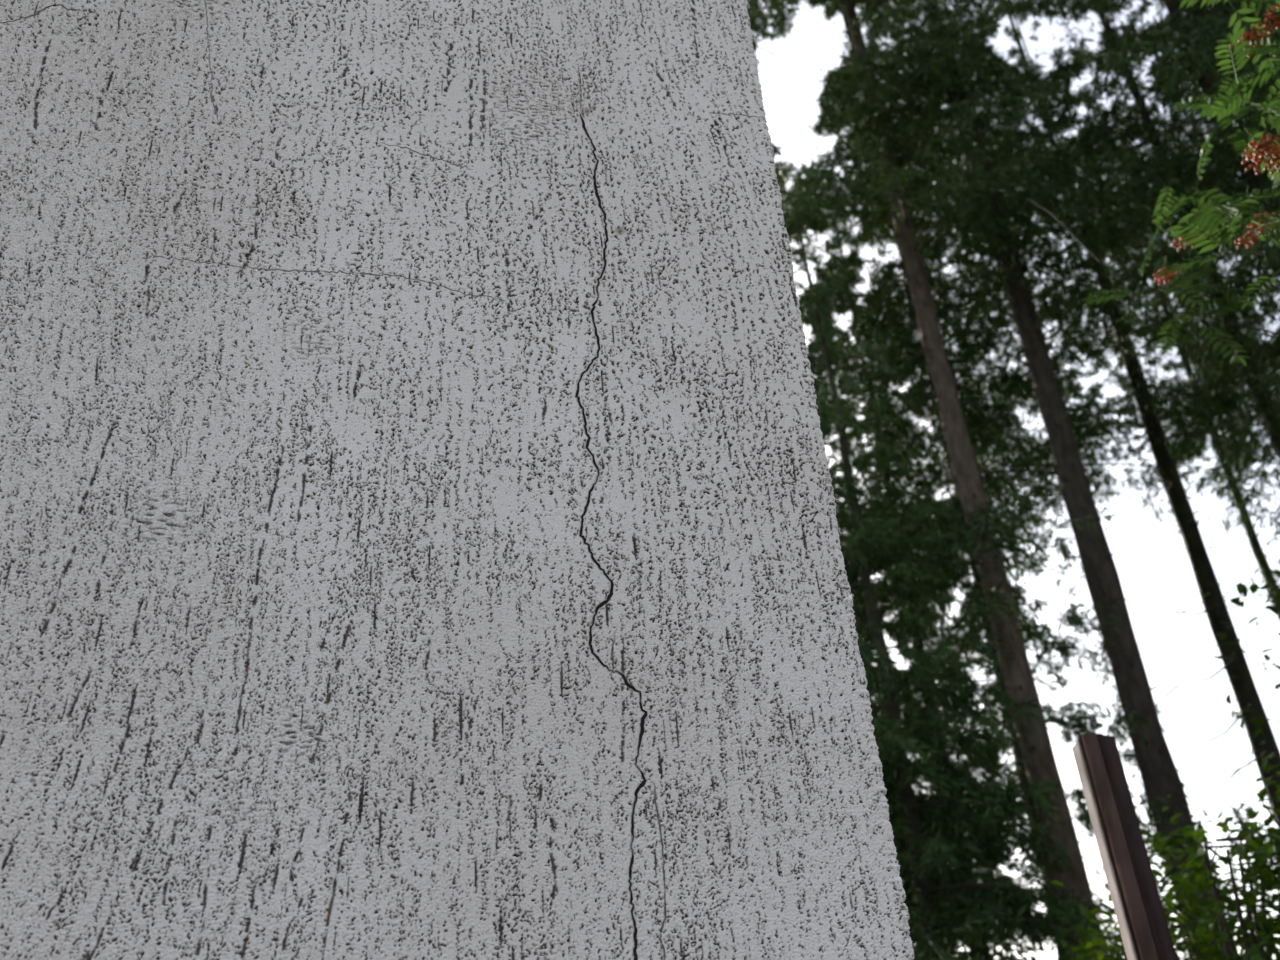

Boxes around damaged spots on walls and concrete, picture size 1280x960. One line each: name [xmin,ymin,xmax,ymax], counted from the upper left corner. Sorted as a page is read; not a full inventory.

crack [575,66,667,960]